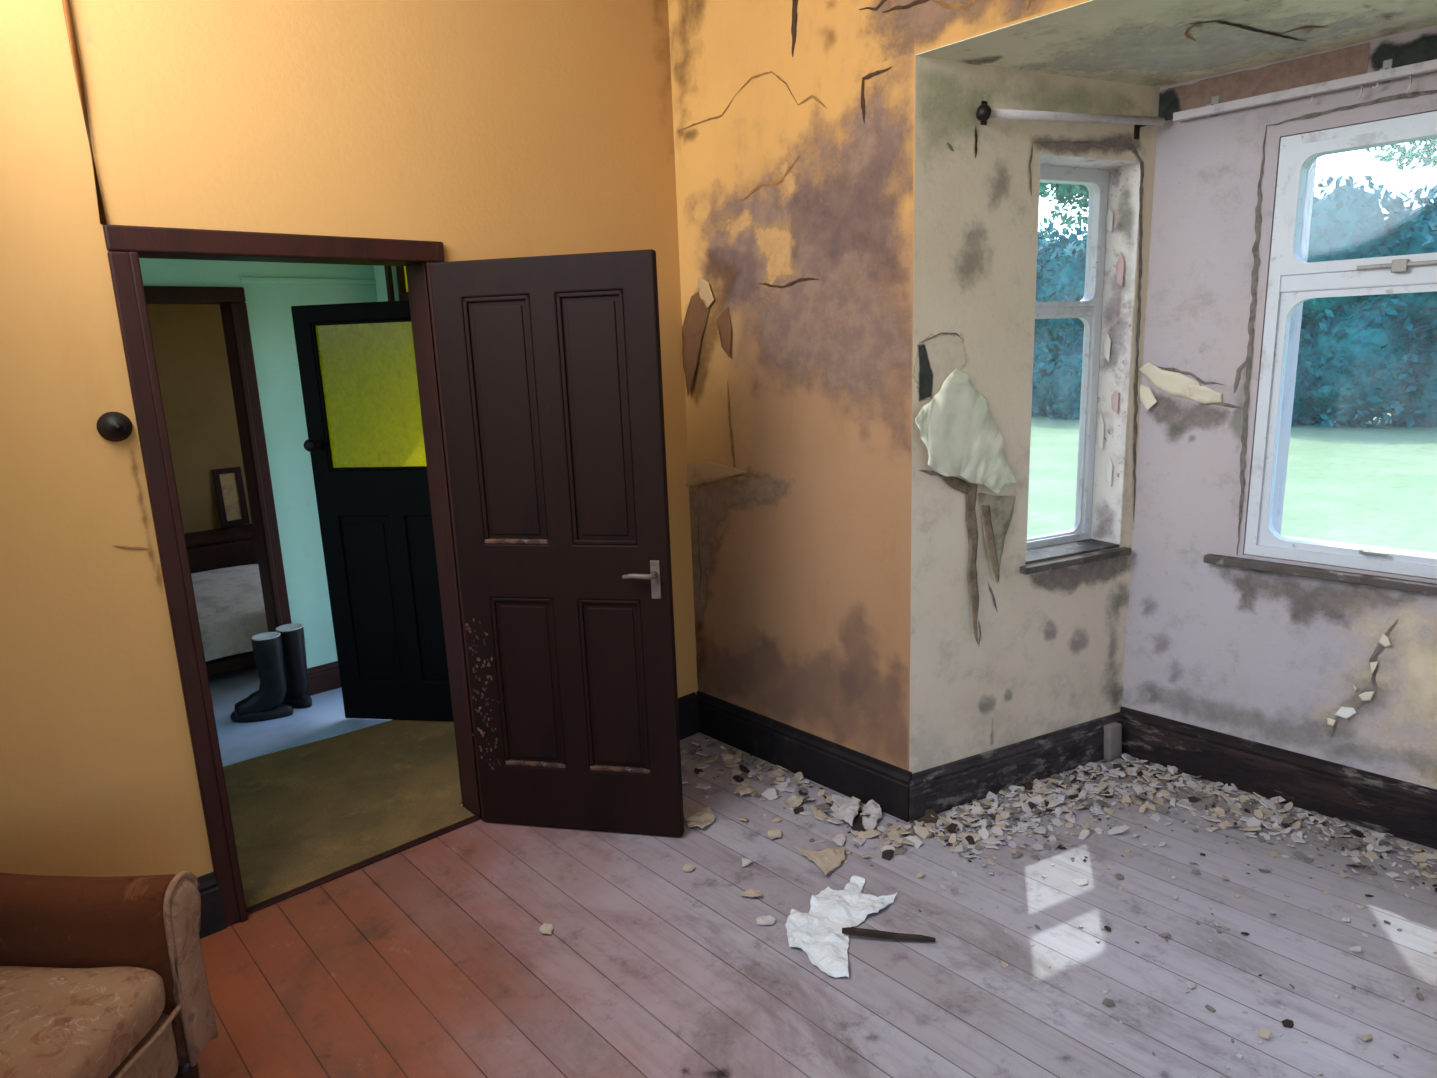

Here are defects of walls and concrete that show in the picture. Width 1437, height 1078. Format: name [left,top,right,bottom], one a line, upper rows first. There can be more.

crack [681,0,826,130]
leakage [1370,34,1437,71]
leakage [693,310,717,394]
flaking render [697,87,966,430]
peeling [1029,135,1243,530]
flaking render [686,461,787,635]
leakage [1236,570,1437,723]
peeling [1325,618,1398,738]